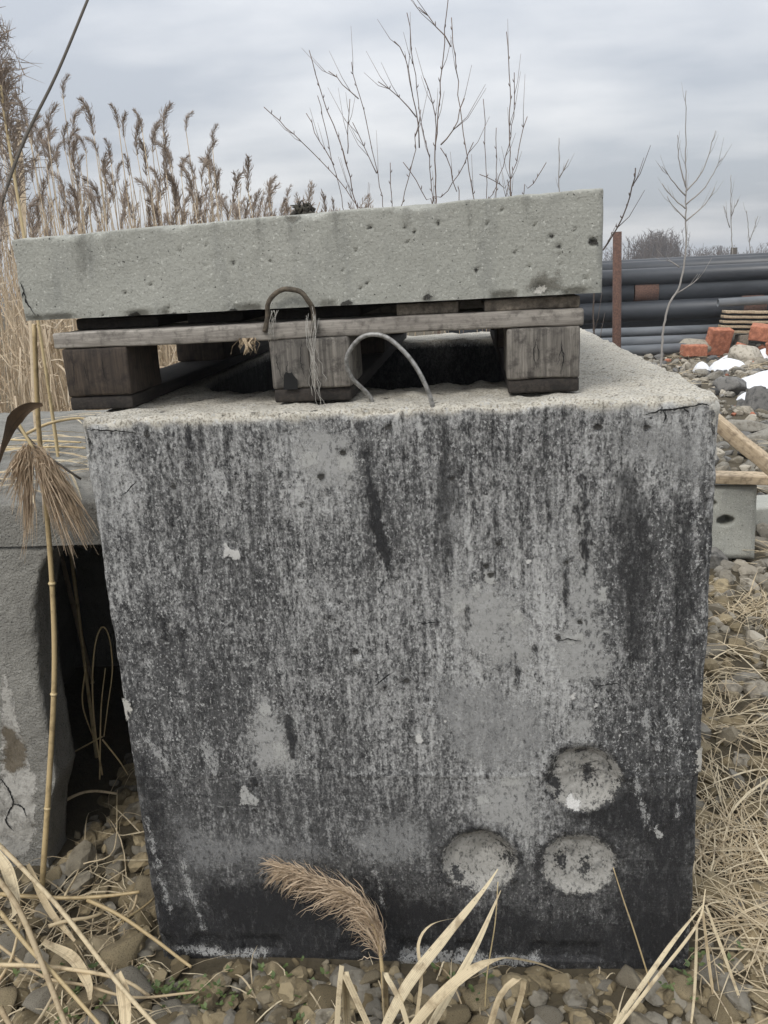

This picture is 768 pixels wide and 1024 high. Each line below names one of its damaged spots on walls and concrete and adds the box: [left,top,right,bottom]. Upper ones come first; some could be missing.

peeling [223,542,241,560]
leakage [359,421,392,608]
leakage [437,421,459,572]
leakage [561,563,570,615]
leakage [565,472,593,576]
leakage [613,460,660,686]
leakage [1,726,27,773]
crack [1,779,27,831]
peeling [239,786,259,806]
leakage [283,714,296,759]
peeling [432,702,635,899]
leakage [137,759,695,969]